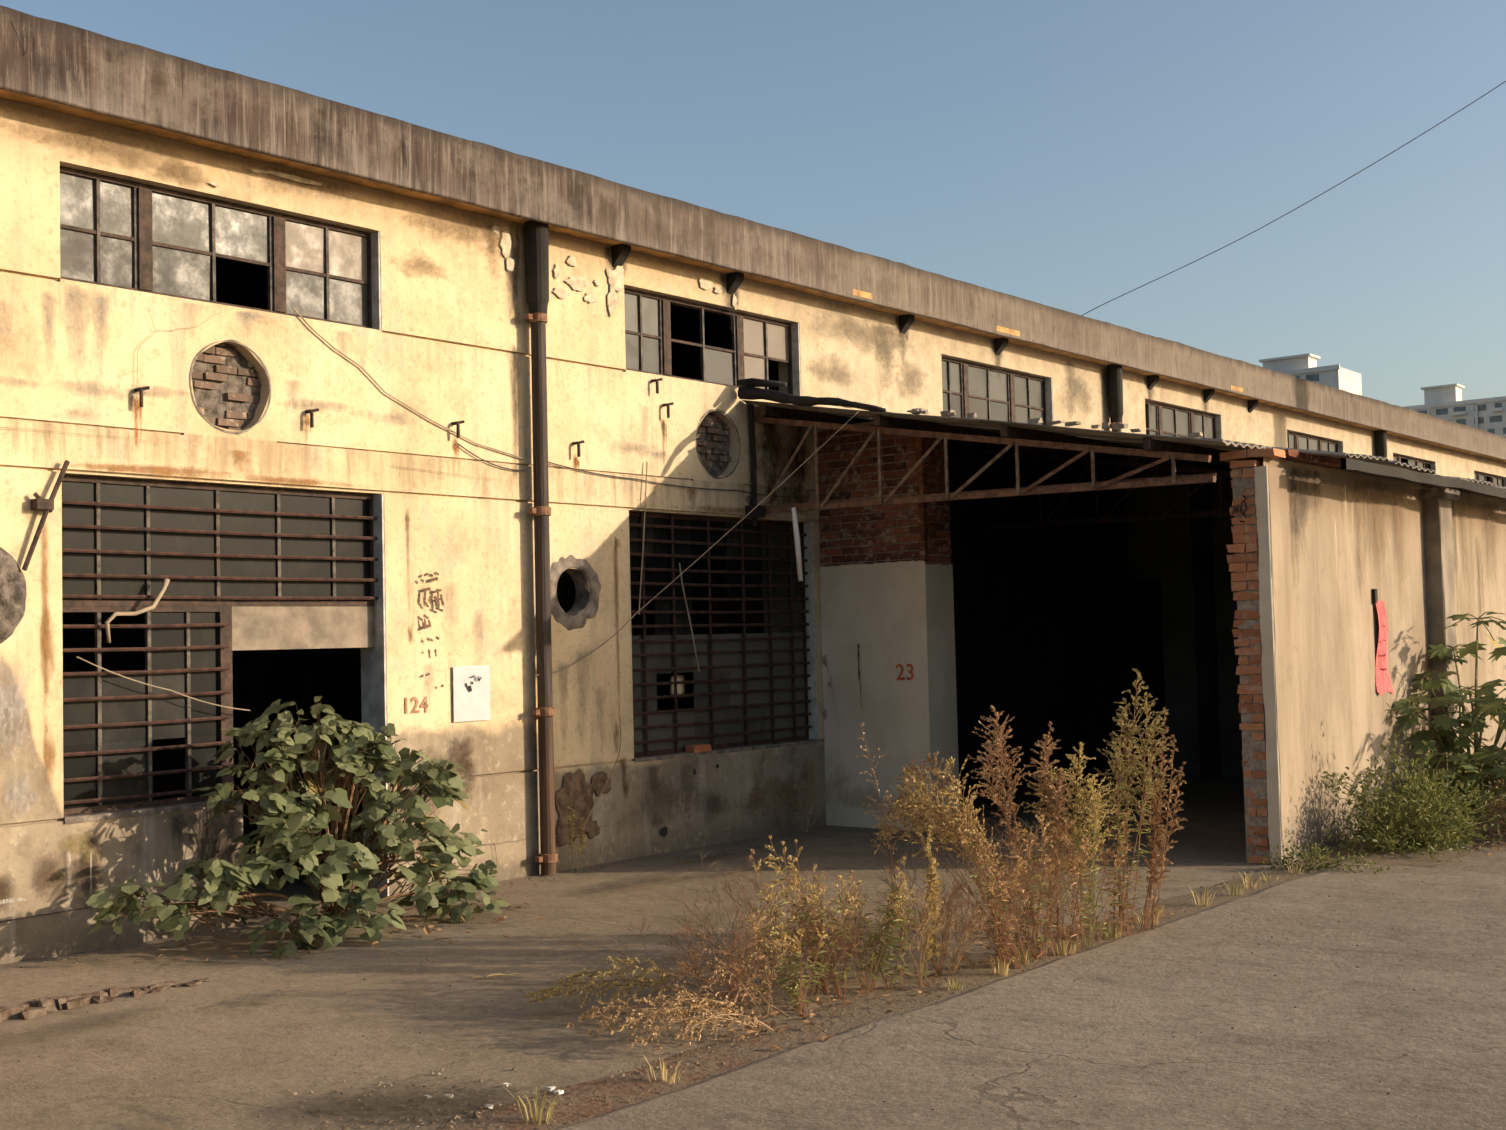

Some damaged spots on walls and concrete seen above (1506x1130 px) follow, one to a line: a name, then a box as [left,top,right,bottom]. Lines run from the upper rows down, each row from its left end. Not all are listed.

flaking render [491,225,514,271]
flaking render [606,266,625,317]